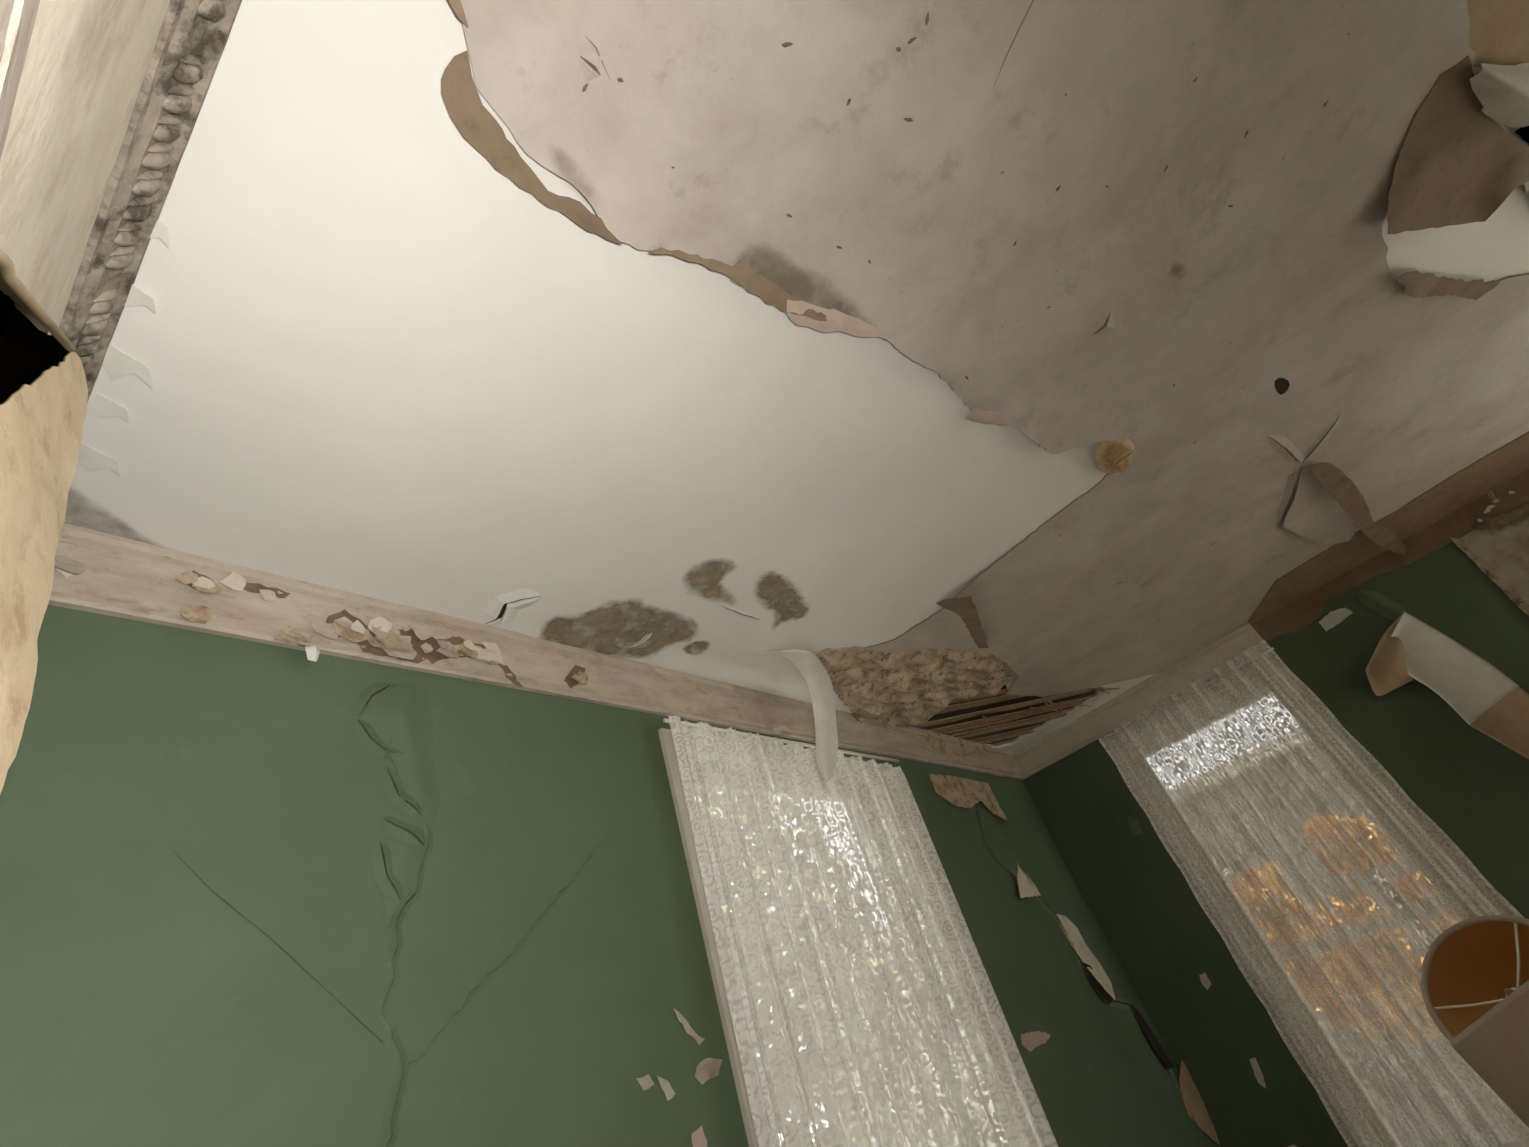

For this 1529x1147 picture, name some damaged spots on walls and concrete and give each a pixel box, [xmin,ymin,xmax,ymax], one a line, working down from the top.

spalling [0,290,13,337]
spalling [1248,432,1529,641]
peeling [54,555,87,578]
peeling [176,570,290,624]
damp [687,561,808,625]
peeling [274,610,523,687]
peeling [564,665,589,689]
damp [543,601,708,658]
spalling [757,646,1220,1147]
peeling [673,1008,723,1085]
peeling [636,1074,676,1101]
peeling [691,1126,707,1147]